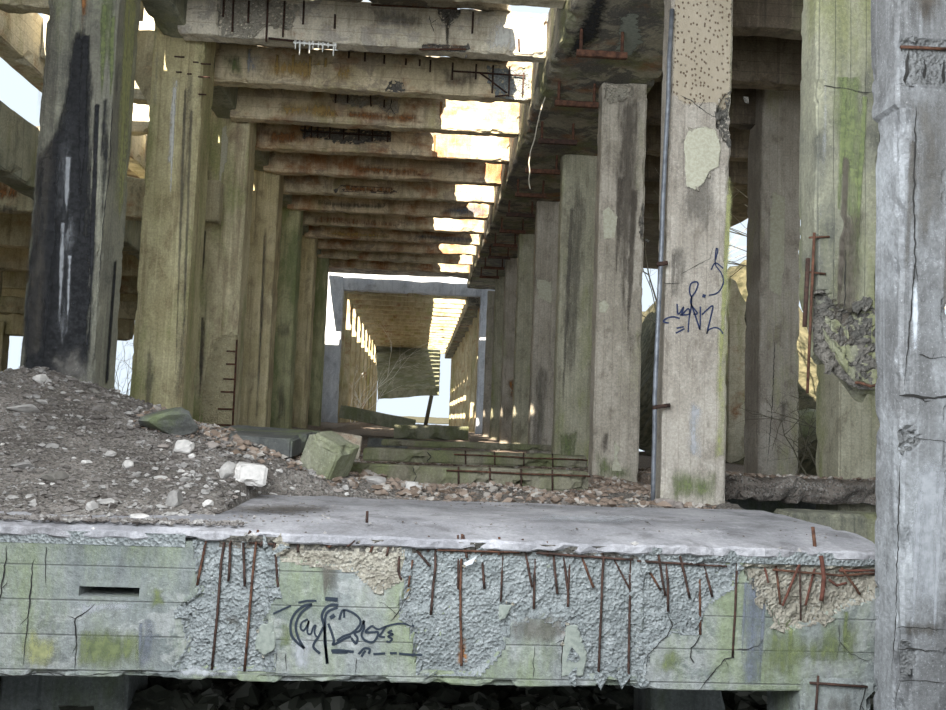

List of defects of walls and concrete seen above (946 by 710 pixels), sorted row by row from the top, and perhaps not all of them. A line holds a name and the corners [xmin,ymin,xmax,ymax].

leakage [36,0,129,339]
spalling [371,4,531,100]
peeling [673,0,732,192]
peeling [769,192,787,296]
spalling [802,232,878,393]
leakage [835,77,867,345]
crack [899,111,946,402]
crack [0,546,143,677]
spalling [0,527,877,710]
crack [646,614,688,668]
crack [690,636,764,689]